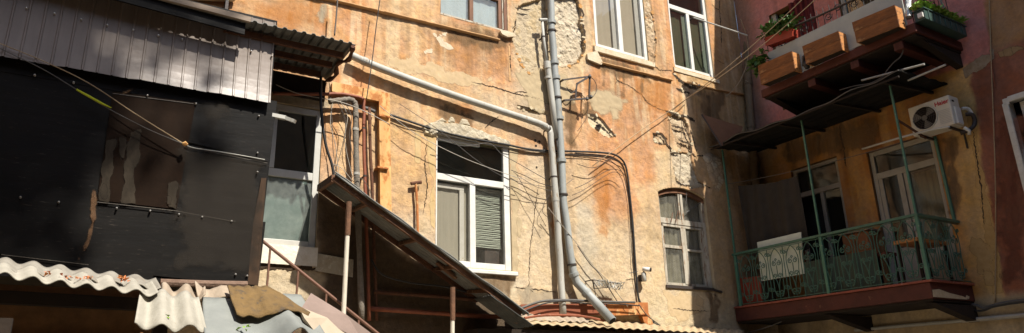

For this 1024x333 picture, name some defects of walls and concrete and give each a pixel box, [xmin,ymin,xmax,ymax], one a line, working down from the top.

spalling [512,0,586,115]
spalling [653,113,705,189]